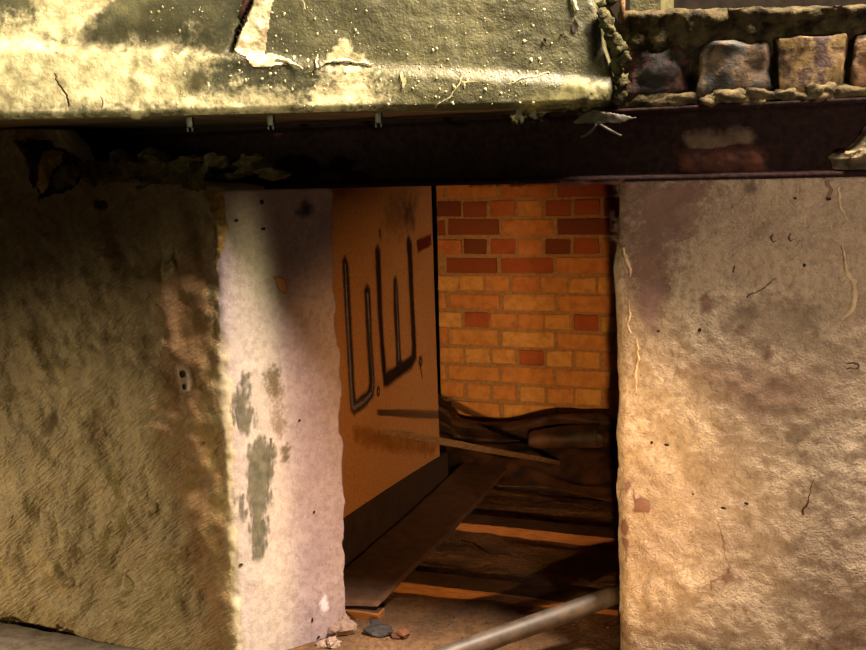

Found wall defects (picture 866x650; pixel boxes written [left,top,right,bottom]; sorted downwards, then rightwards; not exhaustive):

crack [54,73,70,107]
peeling [0,0,396,119]
crack [230,0,480,108]
flaking render [13,137,82,201]
corrosion [674,128,768,173]
damp [232,364,291,559]
peeling [625,482,650,512]